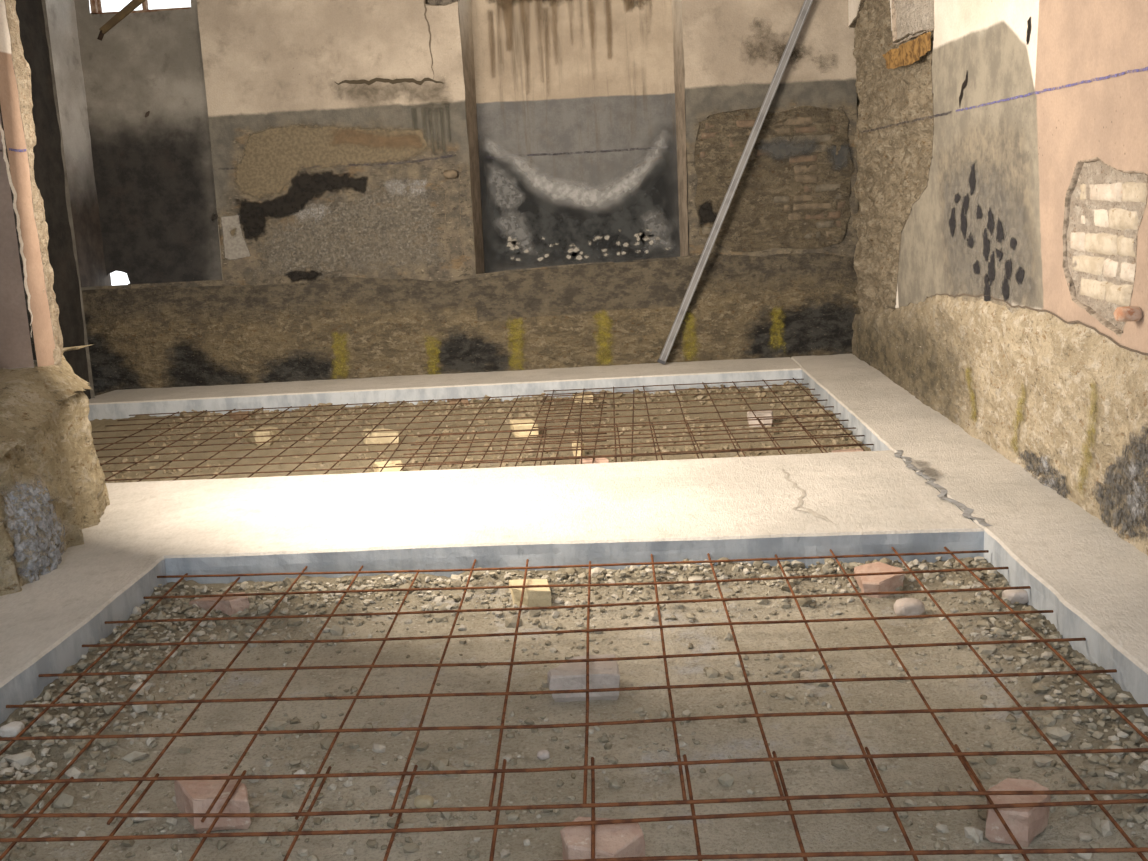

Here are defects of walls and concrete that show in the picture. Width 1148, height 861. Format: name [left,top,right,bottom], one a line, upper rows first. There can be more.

leakage [490,0,556,68]
leakage [589,0,611,52]
flaking render [235,125,428,199]
flaking render [1062,157,1148,337]
crack [776,466,839,525]